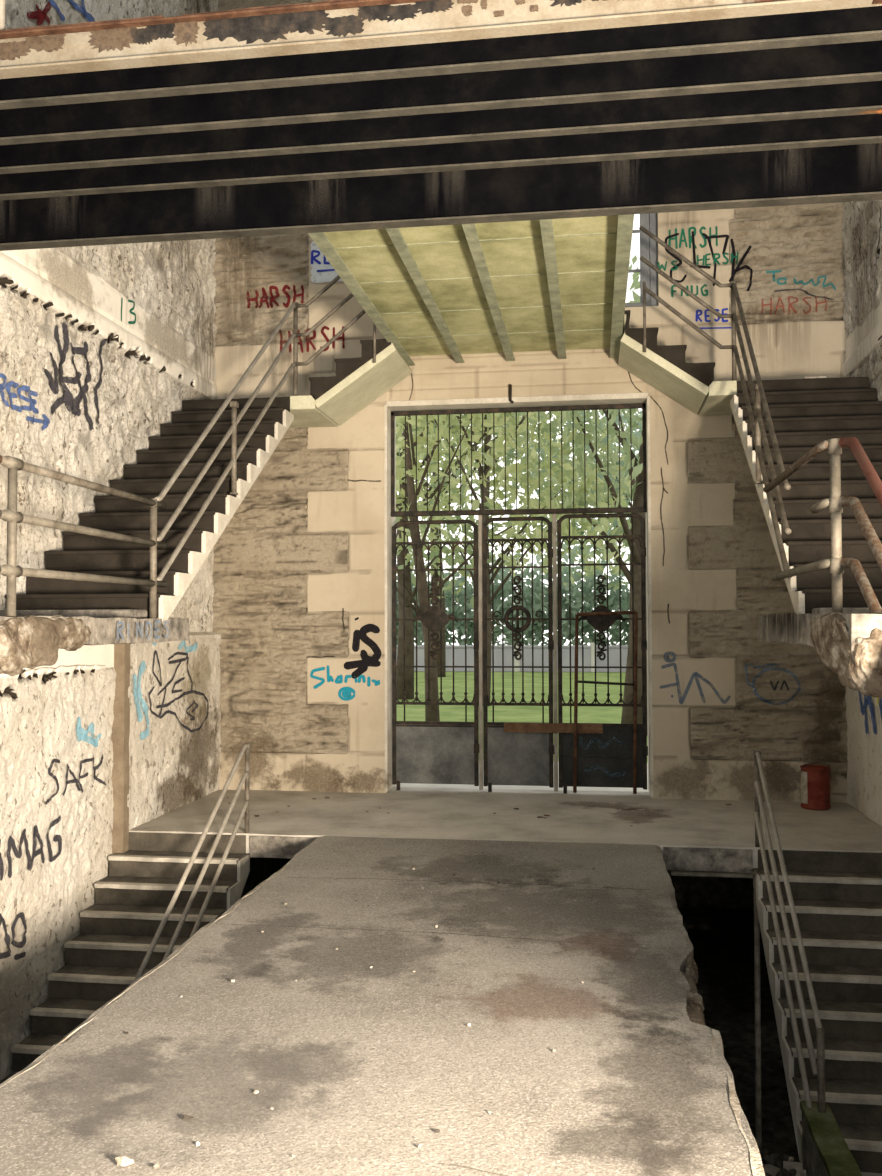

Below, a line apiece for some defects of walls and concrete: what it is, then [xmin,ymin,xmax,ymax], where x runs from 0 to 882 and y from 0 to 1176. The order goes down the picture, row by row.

peeling [0,34,66,60]
peeling [88,0,504,53]
peeling [515,0,624,12]
spalling [0,615,95,699]
spalling [681,955,765,1176]